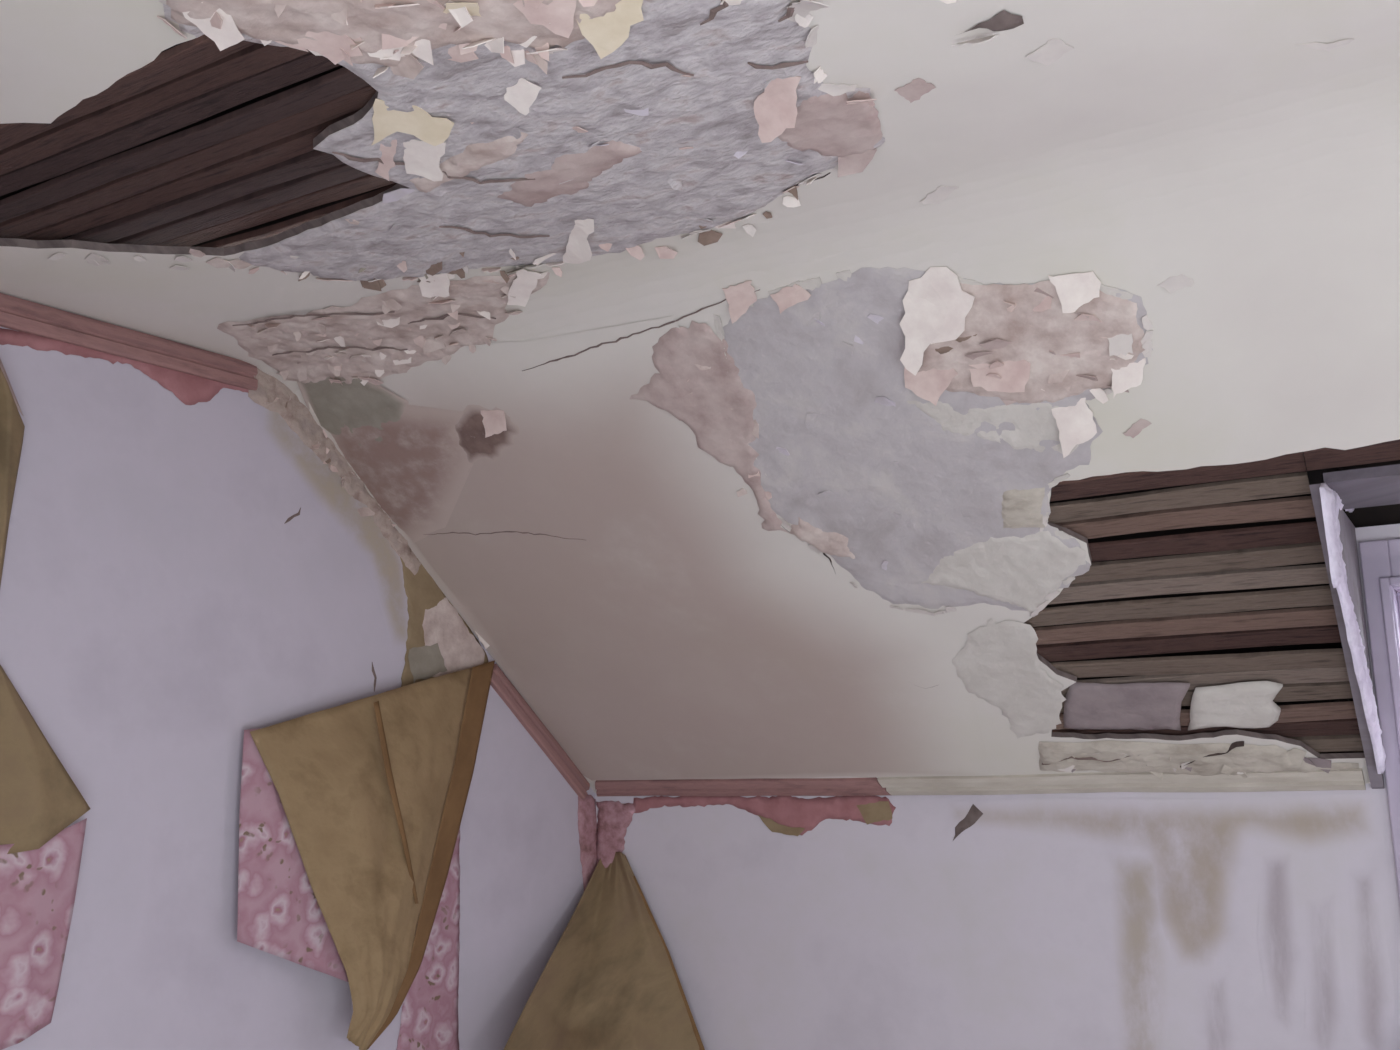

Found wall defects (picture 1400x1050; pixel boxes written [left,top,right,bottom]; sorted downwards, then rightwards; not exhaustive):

flaking render [0,0,885,386]
peeling [895,78,936,103]
peeling [455,405,519,464]
crack [523,290,759,371]
flaking render [629,266,1400,780]
leakage [947,792,1383,1050]